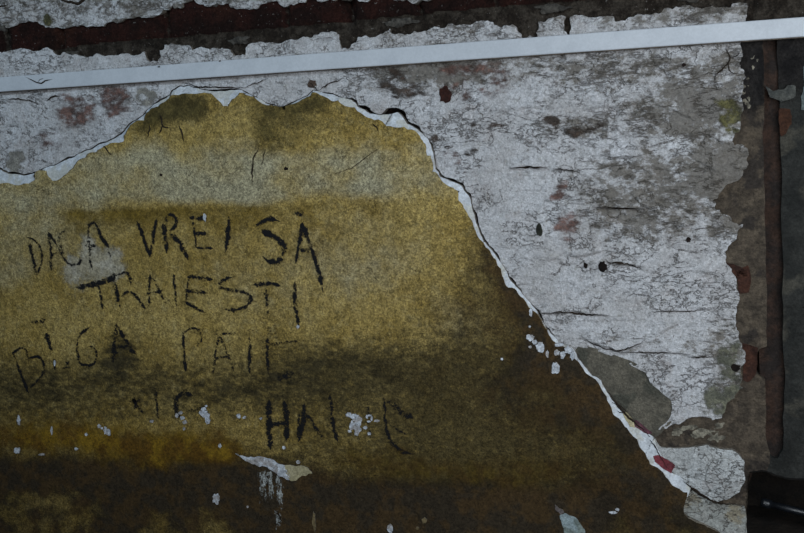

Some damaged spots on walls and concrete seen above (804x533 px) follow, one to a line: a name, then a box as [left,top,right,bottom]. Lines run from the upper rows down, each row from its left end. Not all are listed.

flaking render [0,0,804,77]
leakage [136,87,207,129]
leakage [258,96,323,148]
leakage [5,150,25,172]
leakage [67,207,196,231]
peeling [0,42,749,438]
flaking render [653,97,770,515]
leakage [0,243,718,533]
leakage [702,340,742,415]
peeling [570,345,747,533]
peeling [235,453,312,503]
peeling [555,505,585,533]